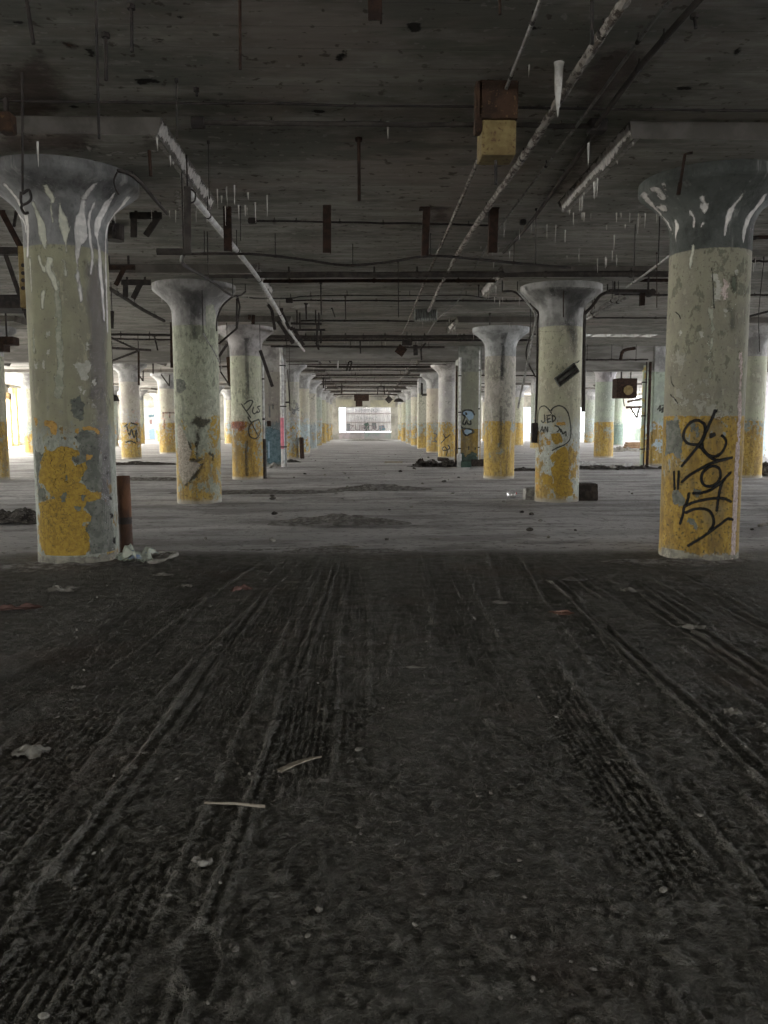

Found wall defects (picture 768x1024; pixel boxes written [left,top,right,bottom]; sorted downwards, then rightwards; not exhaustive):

water stain [106,122,213,220]
water stain [560,125,640,222]
water stain [640,183,679,238]
water stain [689,196,708,227]
water stain [724,195,742,236]
water stain [742,194,766,242]
water stain [0,180,131,539]
peeling [34,342,117,564]
spalling [177,415,221,486]
peeling [536,422,574,496]
spalling [661,349,743,561]